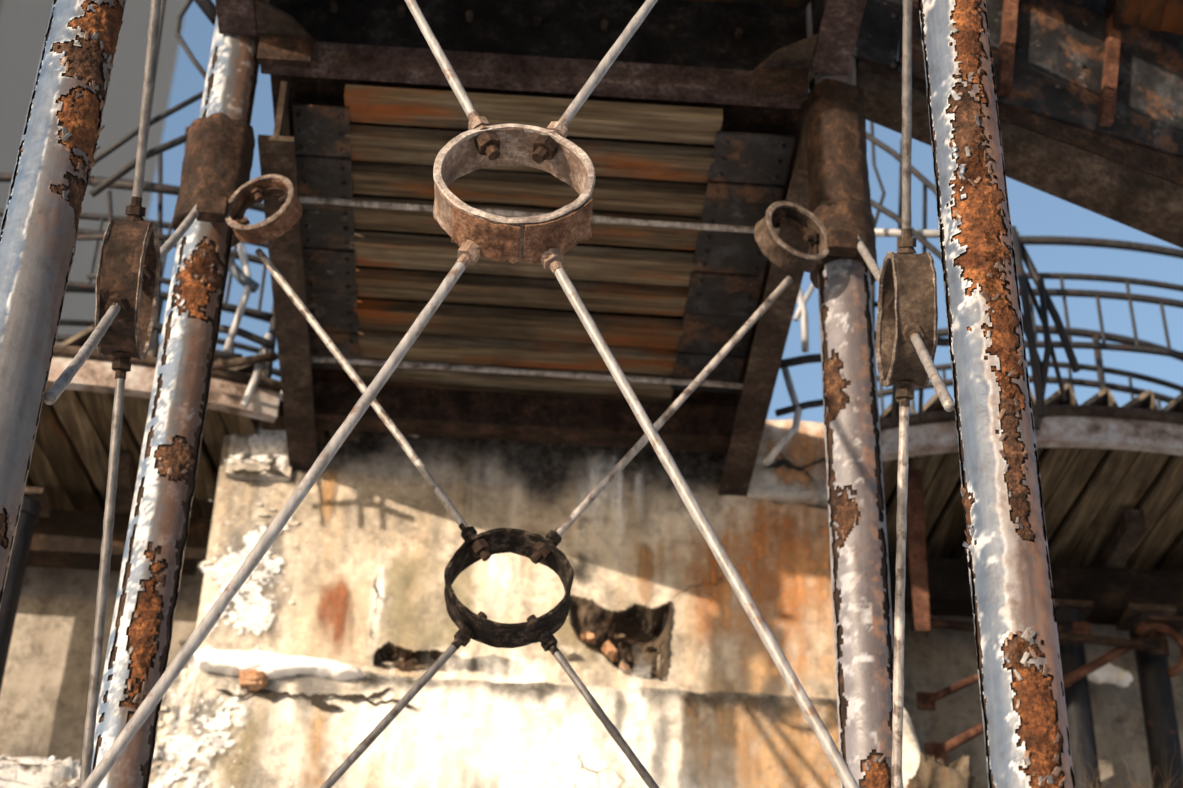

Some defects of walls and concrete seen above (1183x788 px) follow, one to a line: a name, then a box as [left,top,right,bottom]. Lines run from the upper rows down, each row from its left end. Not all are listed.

damp [588,465,622,532]
rust [320,582,347,641]
spalling [373,641,519,675]
spalling [559,595,673,681]
rust [686,503,839,788]
crack [211,687,426,719]
crack [574,754,625,788]